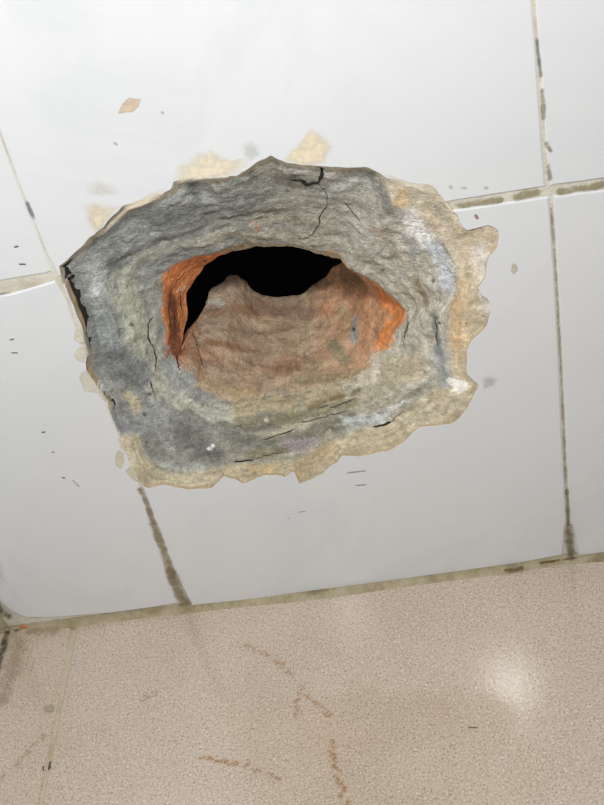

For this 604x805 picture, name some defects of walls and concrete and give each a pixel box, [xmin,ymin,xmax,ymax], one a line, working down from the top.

crack [289,167,360,239]
spalling [60,133,498,488]
water stain [0,629,19,663]